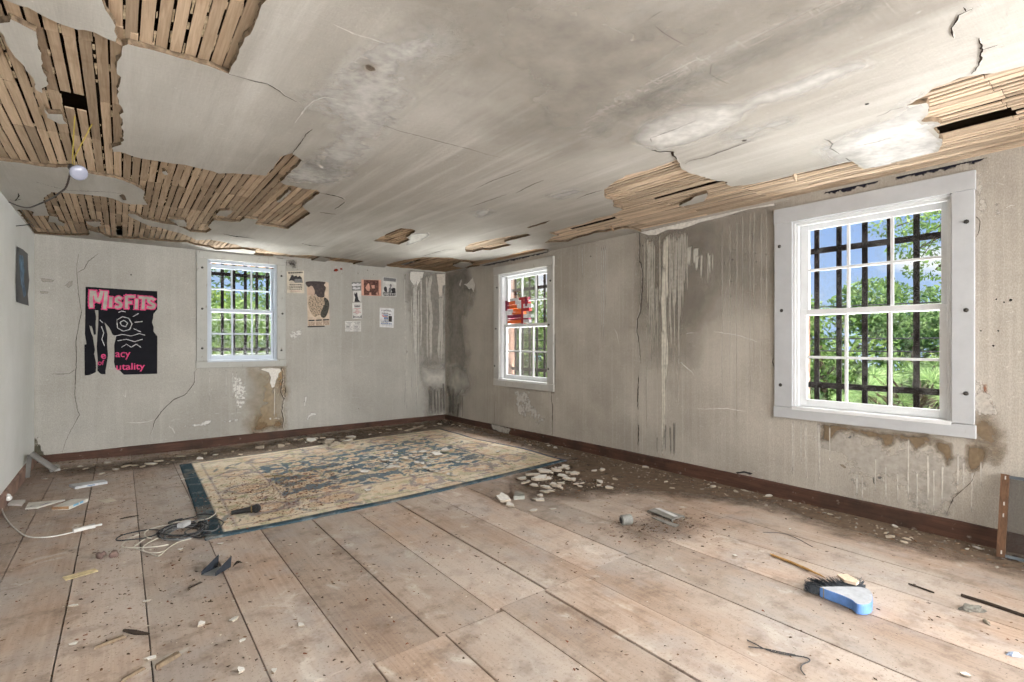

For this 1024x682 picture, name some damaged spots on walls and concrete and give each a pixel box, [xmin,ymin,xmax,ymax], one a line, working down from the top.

flaking render [0,0,363,264]
flaking render [374,228,415,245]
flaking render [387,66,1024,298]
crack [63,254,95,449]
crack [151,370,197,434]
peeling [261,368,281,388]
damp [404,273,471,414]
crack [635,232,643,442]
damp [644,233,754,451]
peeling [820,431,969,514]